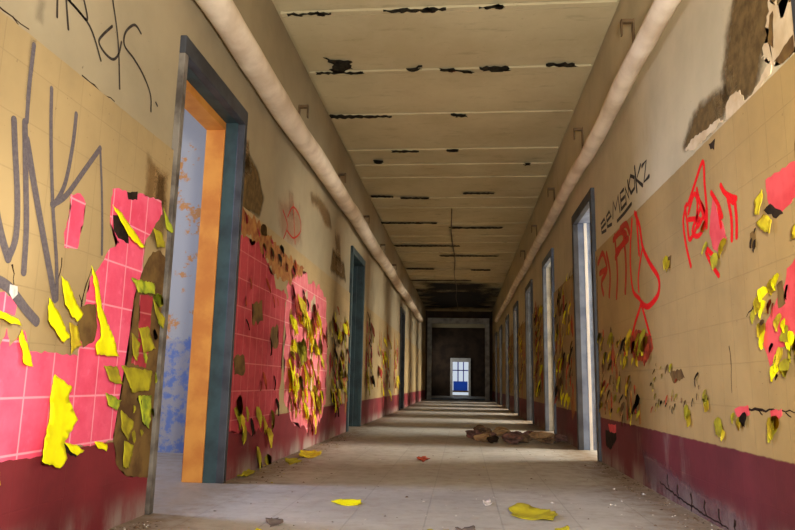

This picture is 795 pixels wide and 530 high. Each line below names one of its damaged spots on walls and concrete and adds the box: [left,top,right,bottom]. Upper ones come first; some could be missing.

peeling [316,57,364,75]
peeling [439,65,511,74]
spalling [685,0,795,151]
peeling [749,161,795,253]
peeling [0,188,174,478]
peeling [229,208,350,469]
peeling [365,314,400,404]
peeling [597,327,709,450]
peeling [714,405,750,442]
peeling [750,259,795,383]
peeling [767,409,782,443]